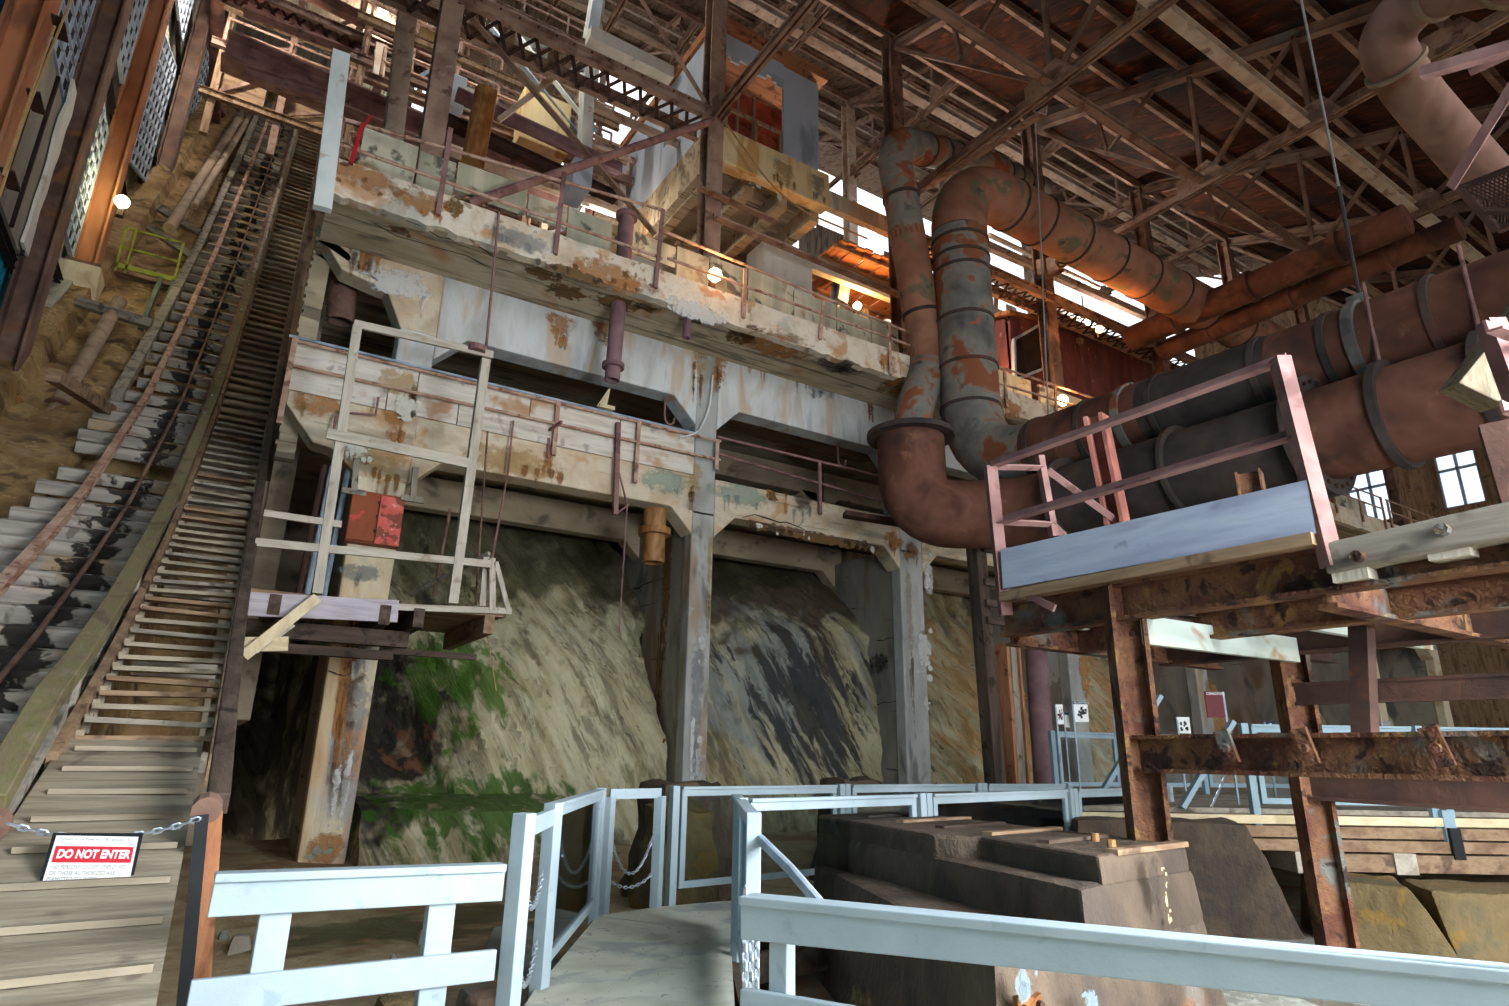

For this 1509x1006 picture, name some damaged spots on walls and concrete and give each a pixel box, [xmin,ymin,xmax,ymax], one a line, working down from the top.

corrosion [336,162,447,223]
corrosion [350,249,381,275]
corrosion [547,313,573,348]
corrosion [295,392,340,415]
corrosion [867,354,906,422]
corrosion [1000,398,1025,418]
corrosion [384,407,405,443]
corrosion [372,467,400,495]
corrosion [521,452,563,483]